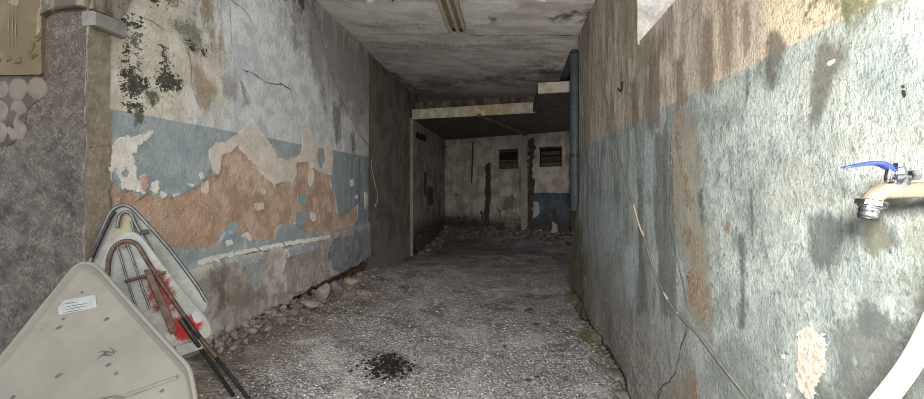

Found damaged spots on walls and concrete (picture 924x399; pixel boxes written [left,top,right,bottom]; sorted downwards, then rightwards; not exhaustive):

leakage [829,0,876,24]
leakage [117,0,248,126]
crack [242,70,291,102]
leakage [759,32,785,83]
leakage [811,43,843,125]
spalling [83,29,368,262]
leakage [809,213,843,267]
crack [654,321,688,399]
spalling [781,322,827,399]